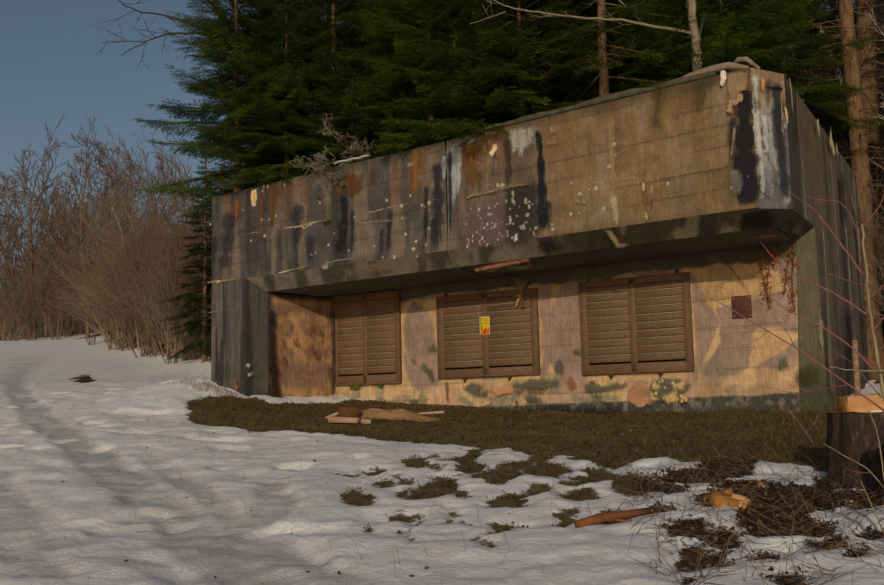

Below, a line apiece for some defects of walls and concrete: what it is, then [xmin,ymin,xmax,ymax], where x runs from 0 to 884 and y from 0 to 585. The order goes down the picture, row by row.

spalling [720,70,748,113]
water stain [335,195,354,253]
water stain [422,145,463,246]
peeling [466,191,537,249]
water stain [507,127,556,230]
water stain [727,74,792,230]